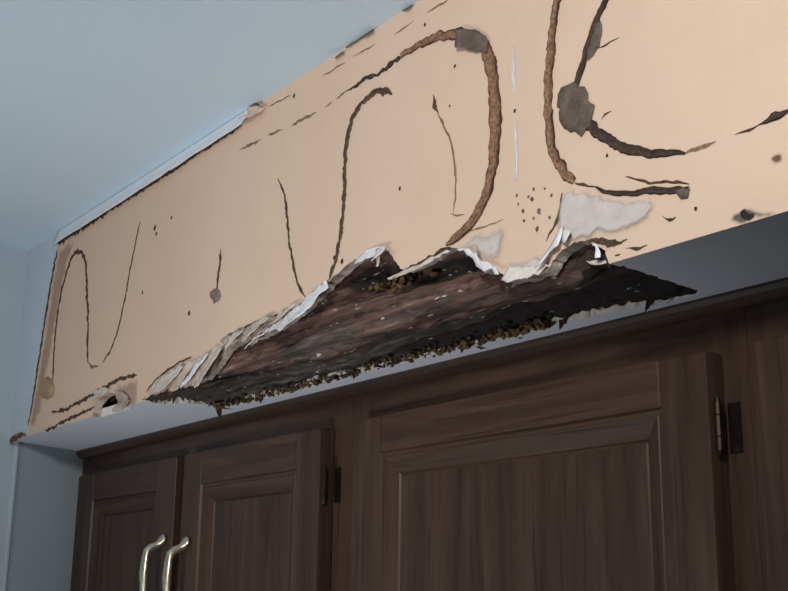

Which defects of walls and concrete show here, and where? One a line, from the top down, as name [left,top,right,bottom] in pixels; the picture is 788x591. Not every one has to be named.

crack [394,0,447,35]
crack [28,125,241,432]
crack [278,179,305,297]
crack [327,87,392,282]
spalling [142,187,697,420]
crack [432,94,504,261]
spalling [92,386,130,412]